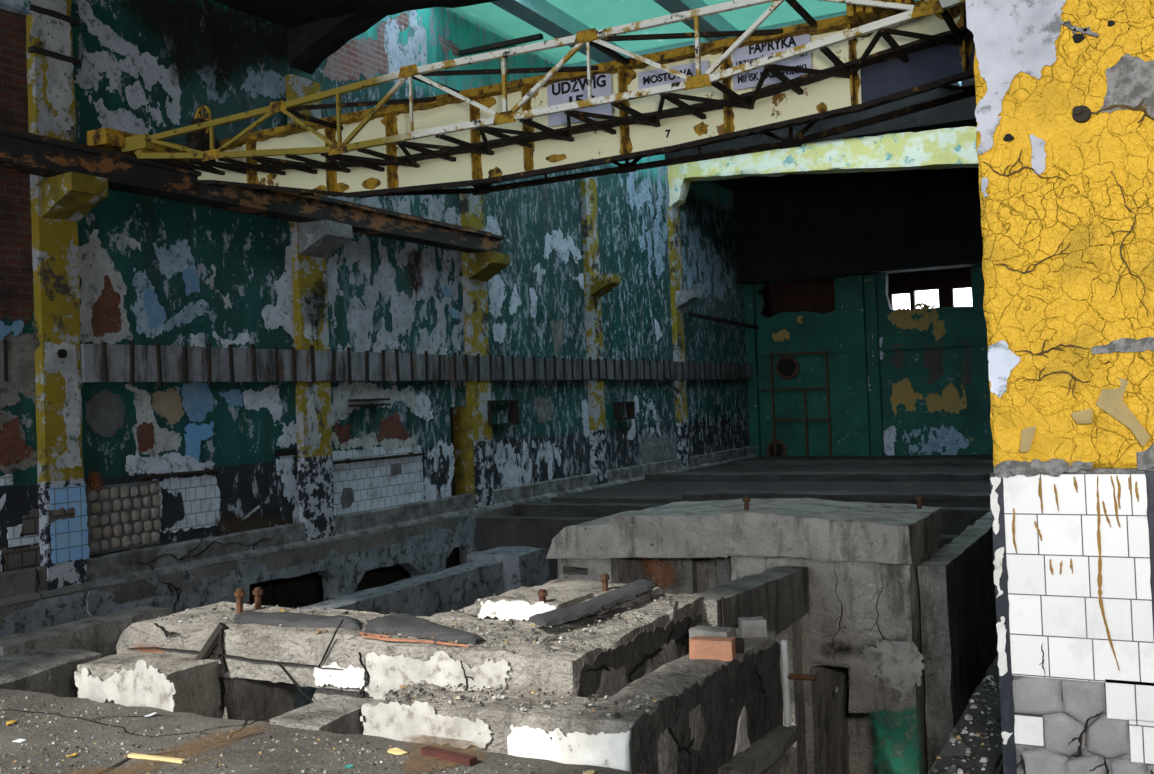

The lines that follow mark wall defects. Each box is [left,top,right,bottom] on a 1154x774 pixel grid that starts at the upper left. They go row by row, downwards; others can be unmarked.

peeling [966,0,1066,155]
rust [545,154,567,163]
rust [693,121,709,136]
crack [984,149,1065,180]
crack [1090,97,1154,123]
flaking render [0,169,253,474]
crack [1015,339,1091,401]
rust [1034,478,1059,541]
rust [1097,475,1139,671]
peeling [295,648,511,755]
peeling [507,642,783,774]
crack [1068,711,1109,774]